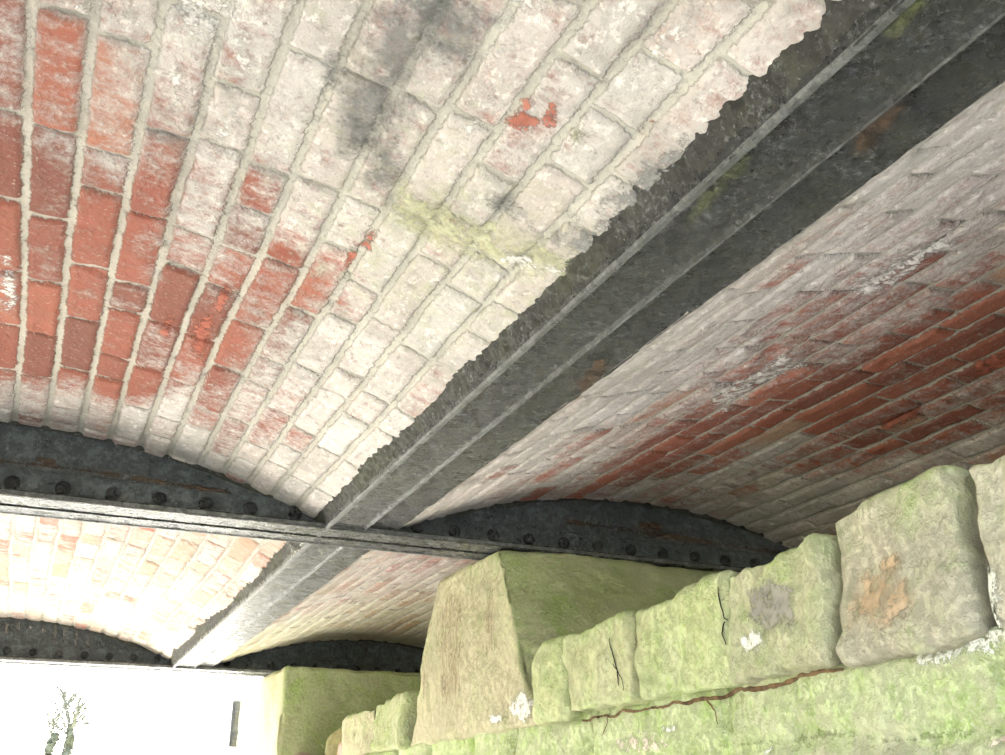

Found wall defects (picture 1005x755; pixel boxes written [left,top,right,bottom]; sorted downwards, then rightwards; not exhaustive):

water stain [652,20,694,55]
spalling [505,98,557,131]
water stain [335,117,398,186]
water stain [393,138,686,276]
rust [848,555,908,623]
crack [582,638,844,735]